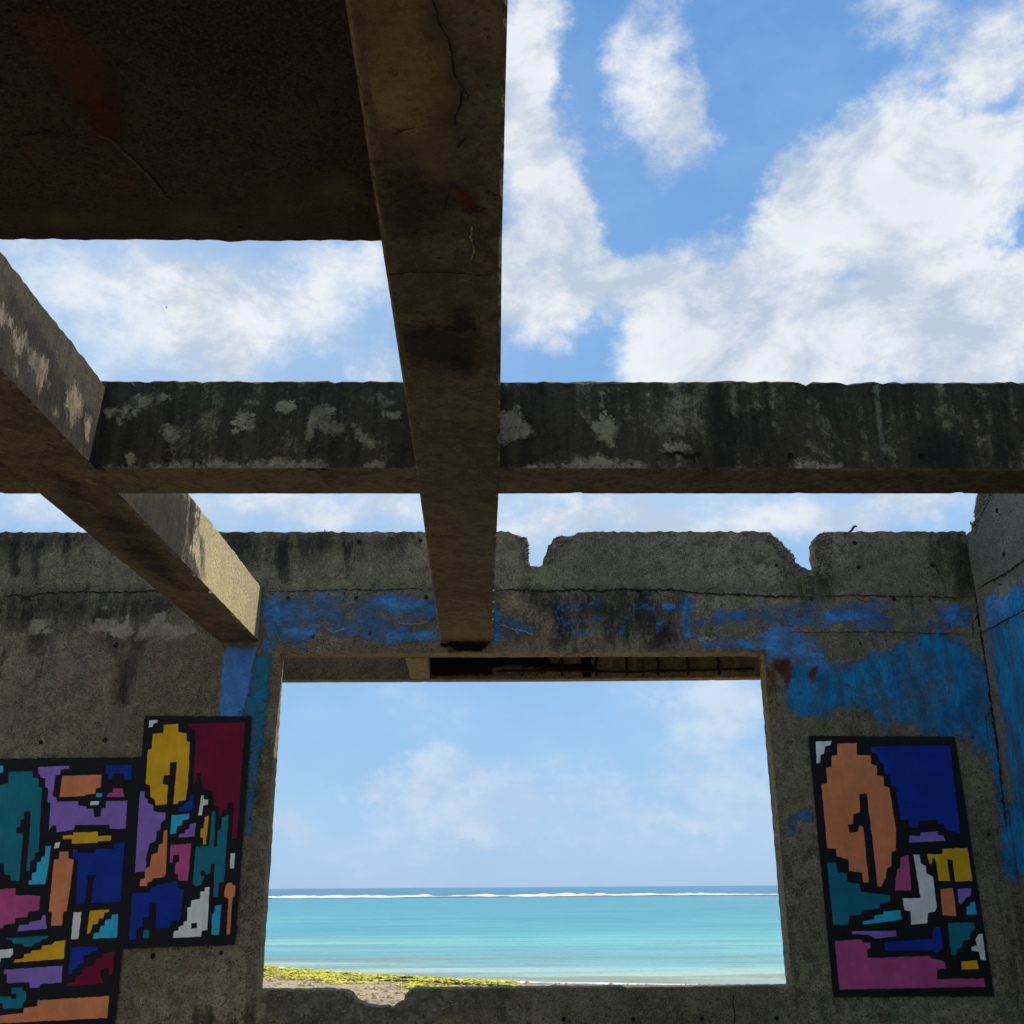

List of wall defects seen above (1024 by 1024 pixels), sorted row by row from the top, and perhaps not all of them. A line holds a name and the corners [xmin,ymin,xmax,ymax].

crack [432,0,469,125]
leakage [0,301,95,460]
crack [3,585,159,601]
crack [270,583,433,599]
peeling [220,577,1024,883]
corrosion [770,659,791,687]